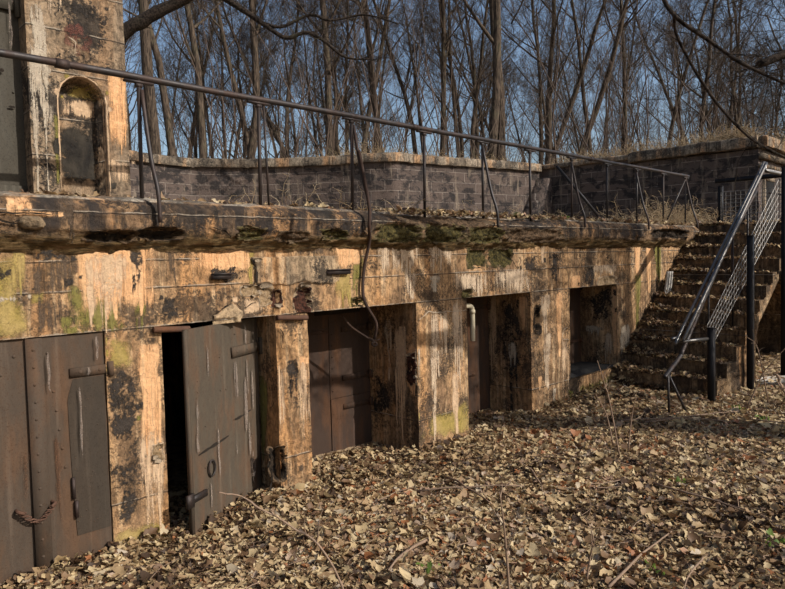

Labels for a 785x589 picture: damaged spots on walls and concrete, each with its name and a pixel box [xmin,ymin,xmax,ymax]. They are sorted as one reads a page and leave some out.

leakage [29,0,133,243]
leakage [0,250,143,333]
spalling [257,282,313,313]
leakage [278,359,311,437]
leakage [373,320,407,448]
leakage [378,248,419,299]
leakage [430,247,452,292]
leakage [430,300,463,441]
leakage [453,246,569,411]
leakage [578,265,629,364]
leakage [108,370,165,528]